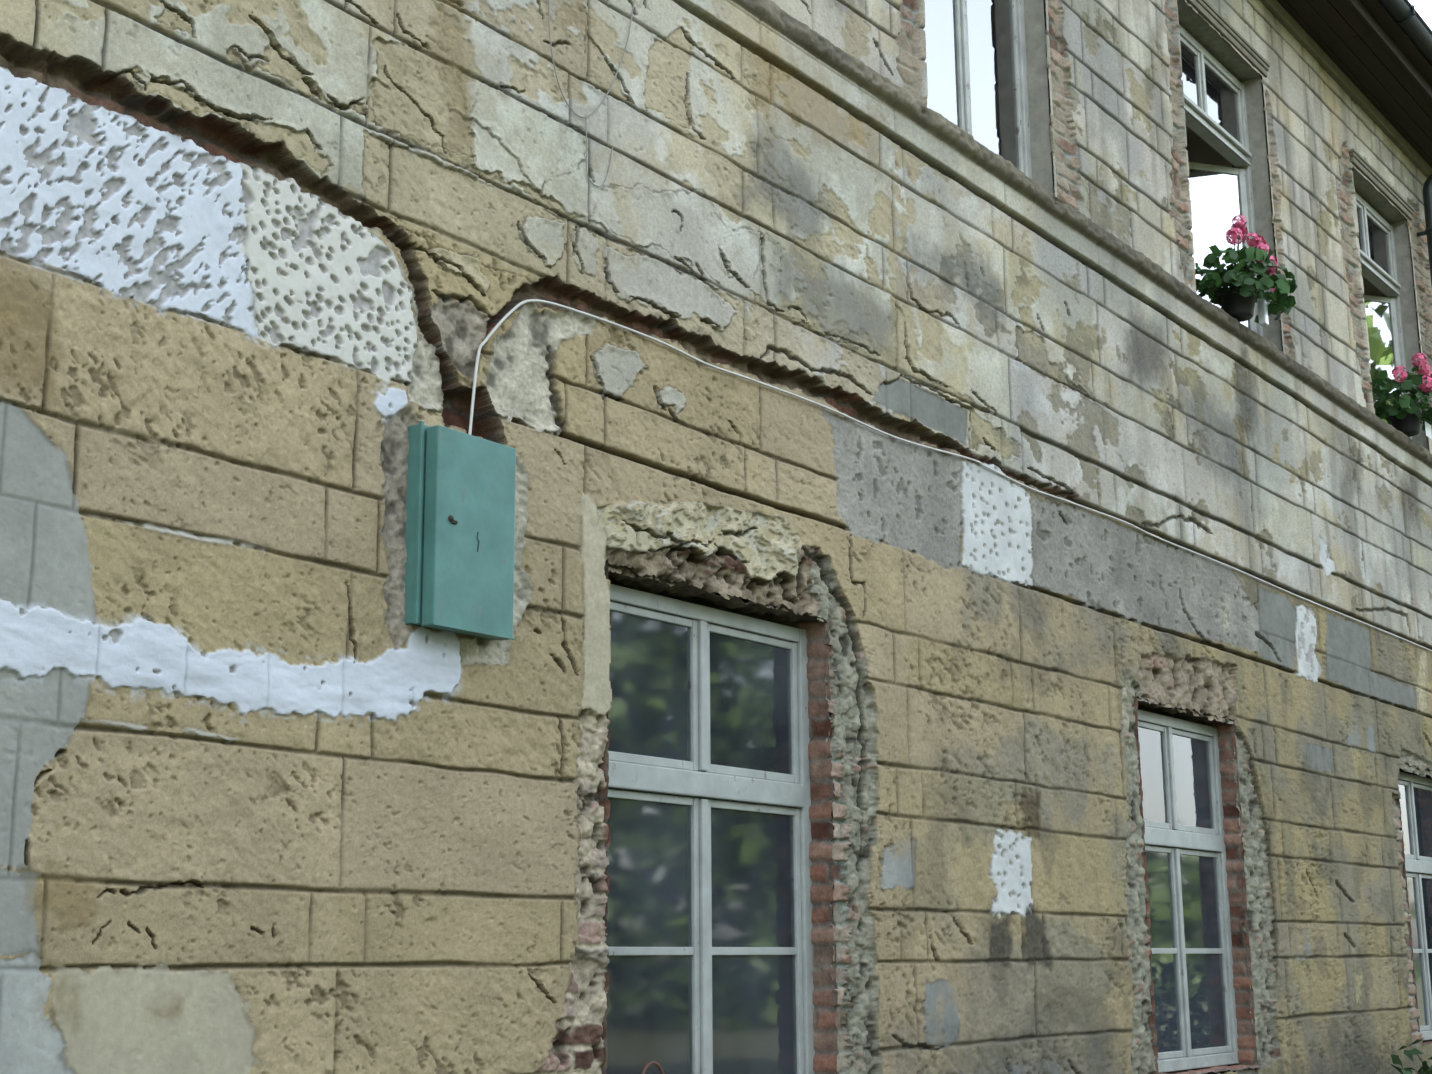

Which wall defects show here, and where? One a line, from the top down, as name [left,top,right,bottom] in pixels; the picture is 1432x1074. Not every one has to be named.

crack [103,68,267,122]
crack [234,14,448,154]
crack [412,245,492,318]
flaking render [120,0,862,665]
crack [545,346,567,459]
crack [517,220,722,329]
crack [674,248,998,451]
spalling [535,493,884,1074]
spalling [1399,745,1432,778]
crack [92,879,205,949]
spalling [1120,652,1282,1074]
spalling [1392,792,1424,1046]